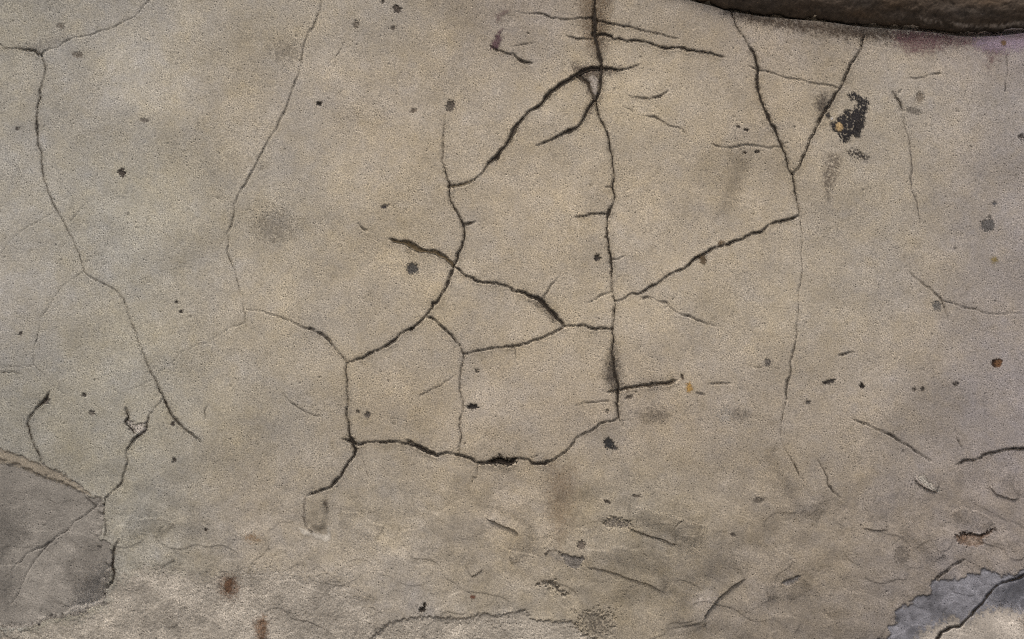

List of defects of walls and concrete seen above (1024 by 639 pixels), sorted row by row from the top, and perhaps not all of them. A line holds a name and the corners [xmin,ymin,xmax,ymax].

crack [18,41,74,242]
crack [236,0,865,495]
crack [20,269,206,587]
crack [956,436,1024,463]
spalling [887,568,1024,639]